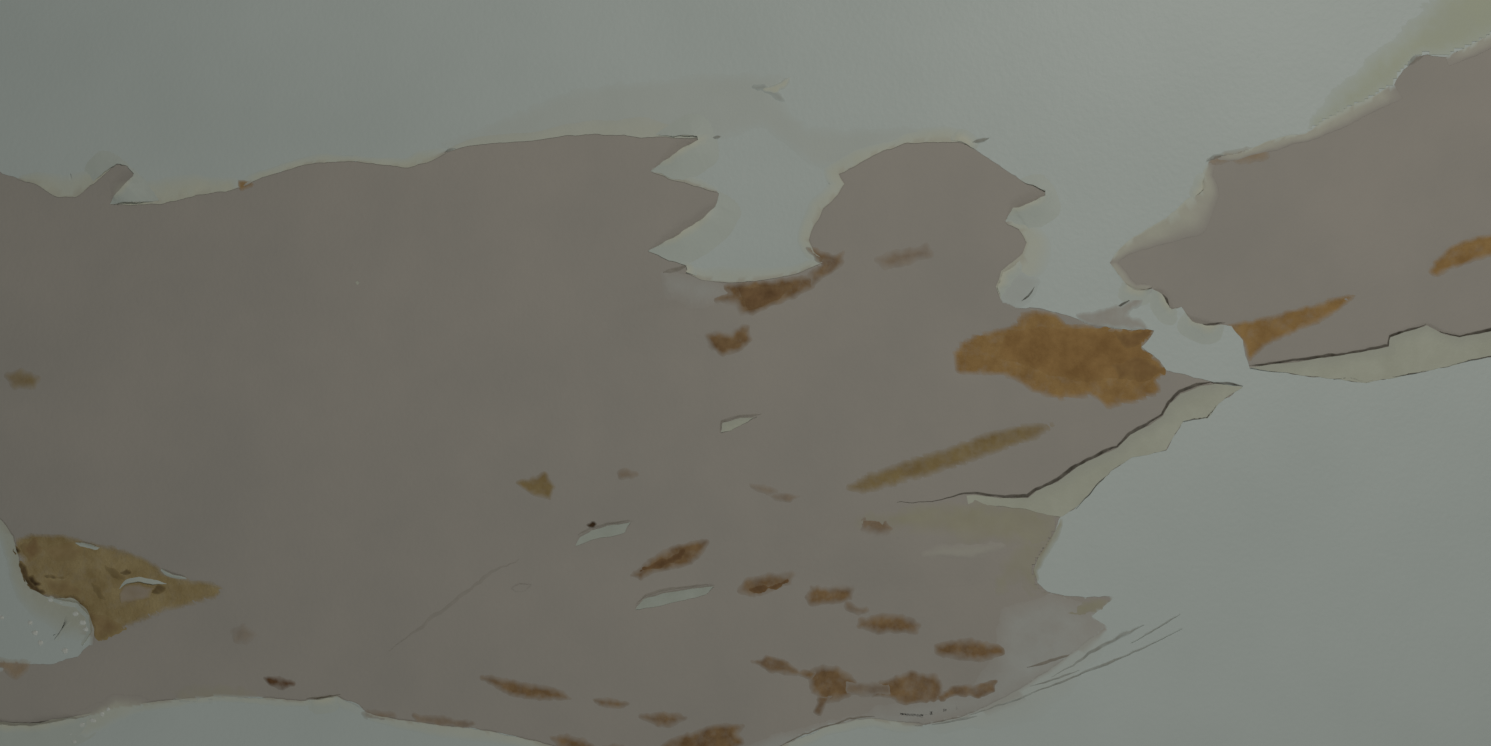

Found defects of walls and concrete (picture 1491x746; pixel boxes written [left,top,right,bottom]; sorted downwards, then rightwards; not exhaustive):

peeling [0,72,1242,746]
peeling [952,34,1491,409]
crack [918,614,1181,726]